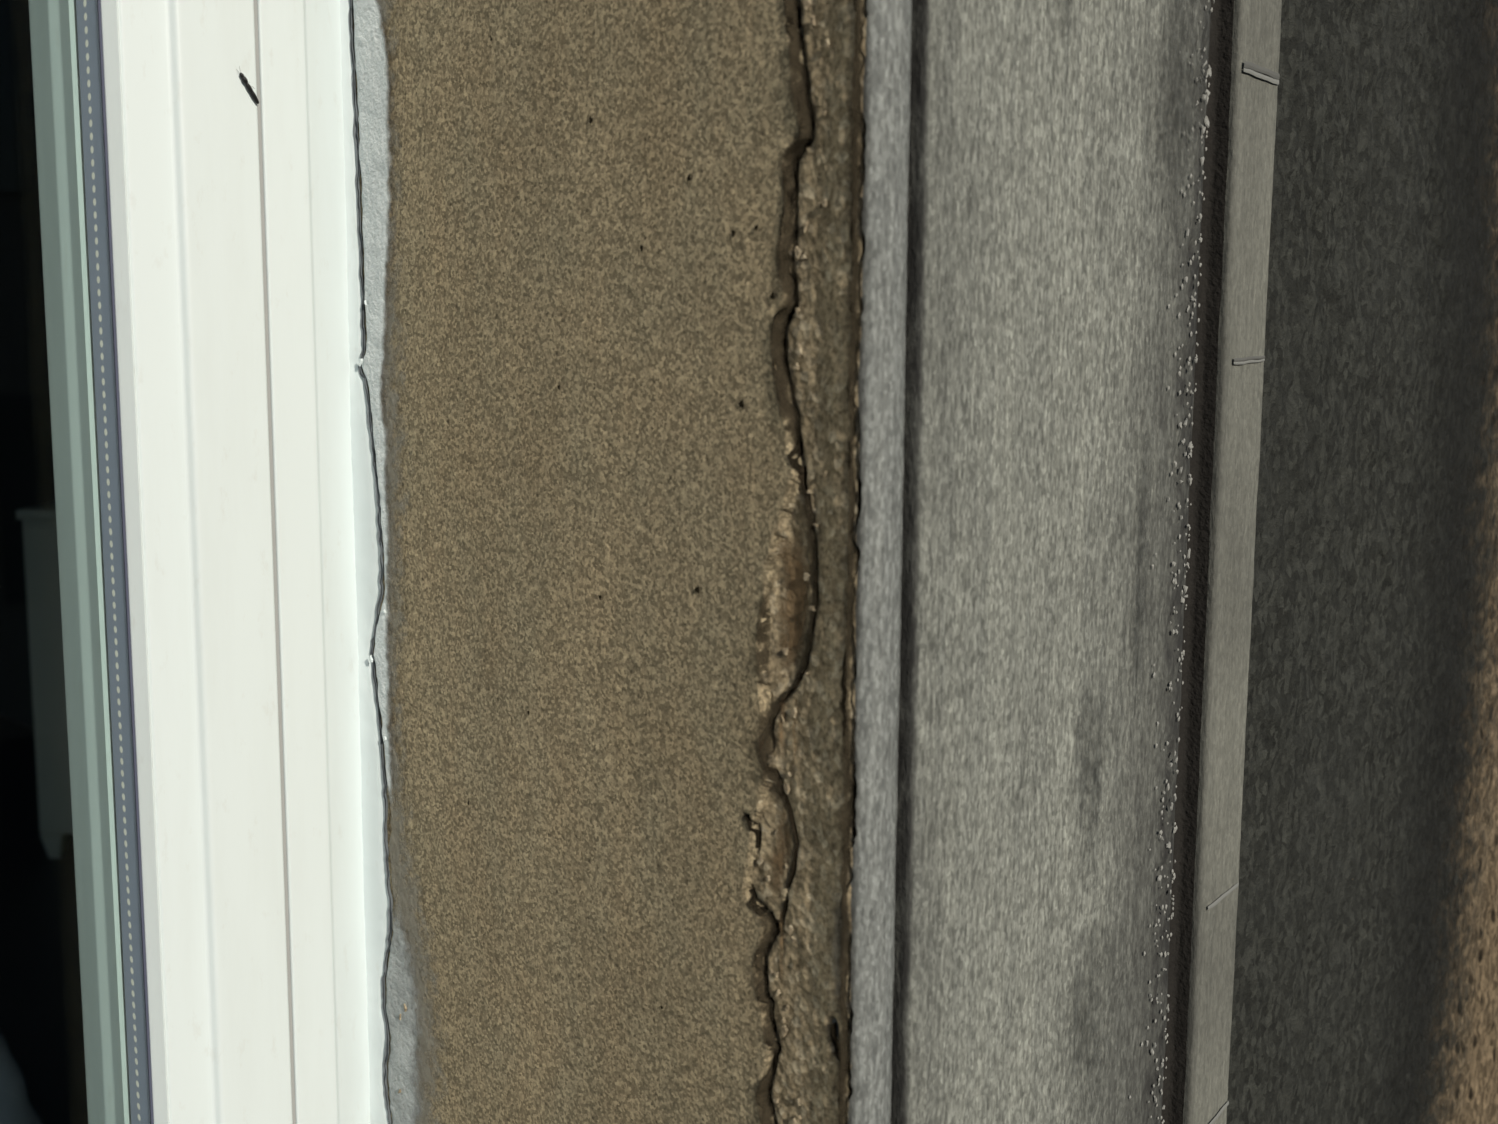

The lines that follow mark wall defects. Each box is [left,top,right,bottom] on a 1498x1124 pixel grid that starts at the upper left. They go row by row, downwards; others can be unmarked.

crack [349,0,393,1124]
crack [743,0,868,1124]